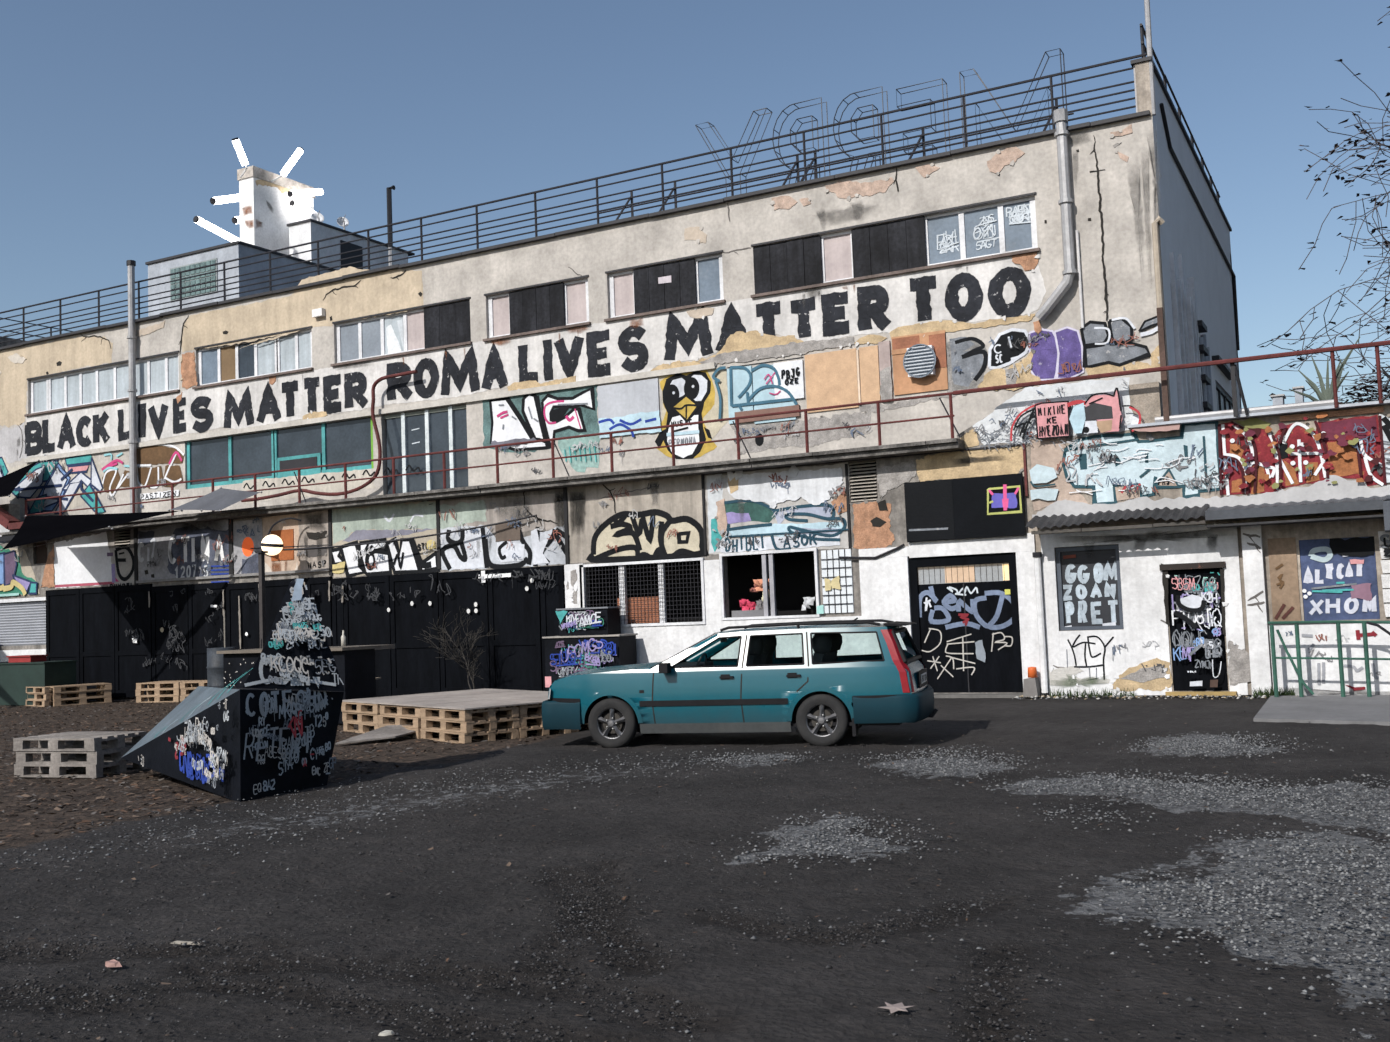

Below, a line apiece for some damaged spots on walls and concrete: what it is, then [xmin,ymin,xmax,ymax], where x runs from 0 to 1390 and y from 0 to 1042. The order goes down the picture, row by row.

peeling [987,147,1025,175]